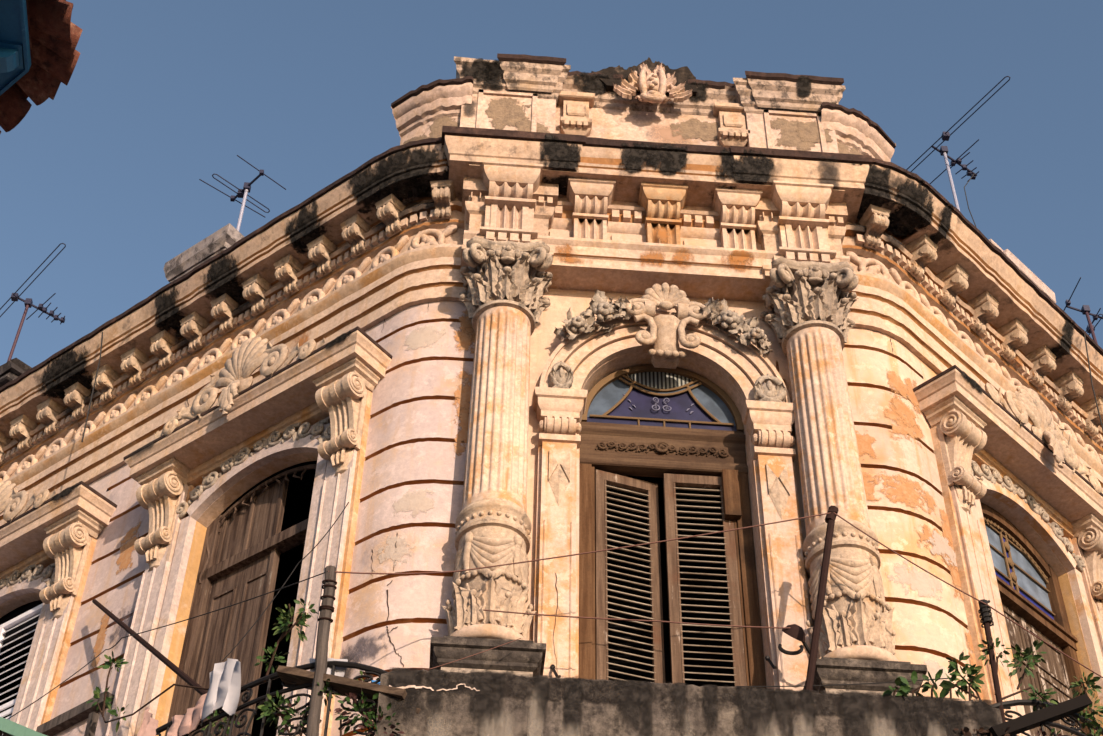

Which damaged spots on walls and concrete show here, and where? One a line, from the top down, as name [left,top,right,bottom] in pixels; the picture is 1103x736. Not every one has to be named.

water stain [460,58,504,90]
water stain [286,197,327,267]
water stain [349,145,449,231]
flaking render [485,97,550,133]
water stain [619,142,688,175]
water stain [716,148,775,189]
flaking render [770,118,862,155]
water stain [852,163,955,250]
peeling [884,370,923,448]
peeling [862,471,964,601]
crack [370,533,480,691]
peeling [921,660,950,689]